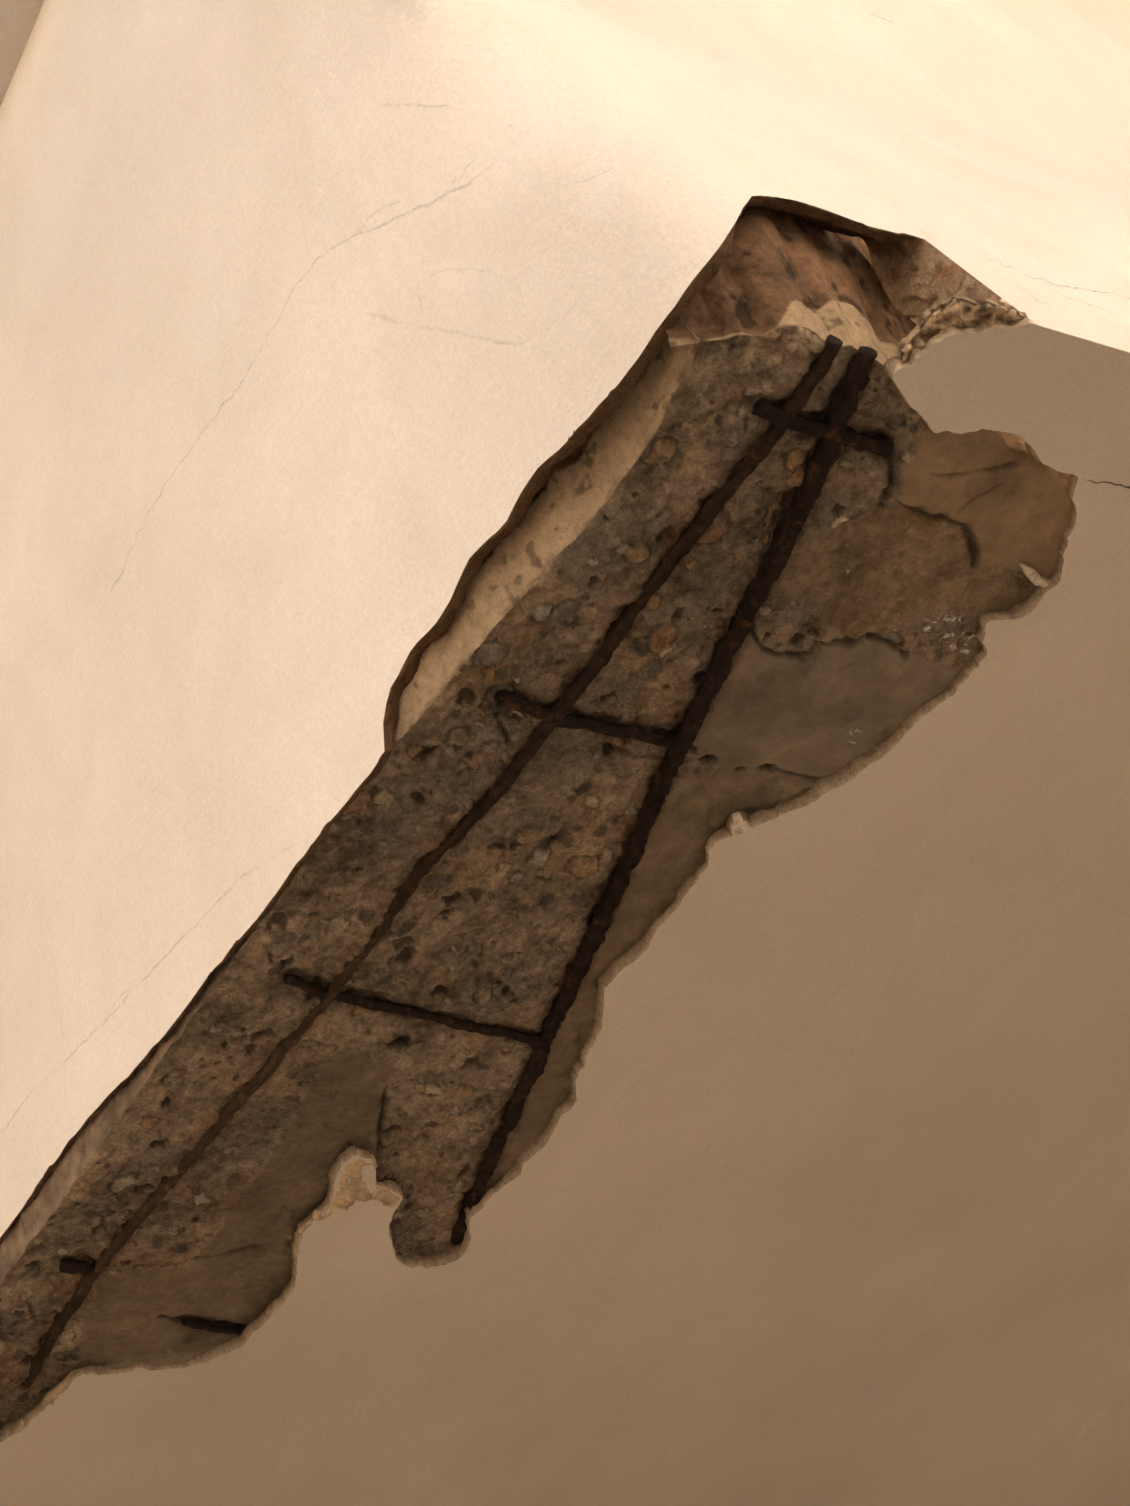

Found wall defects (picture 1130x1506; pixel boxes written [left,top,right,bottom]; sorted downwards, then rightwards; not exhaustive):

spalling [0,195,1078,1442]
crack [1088,480,1130,489]